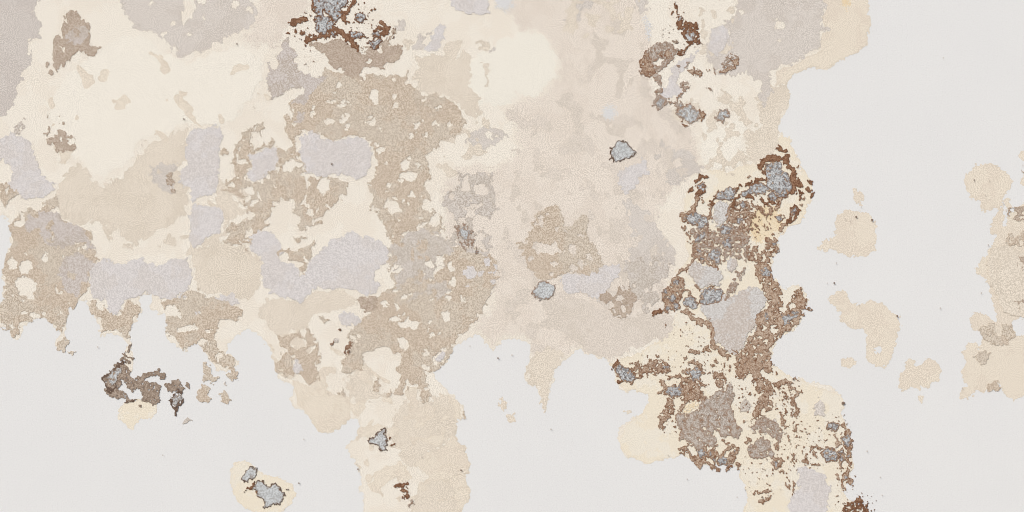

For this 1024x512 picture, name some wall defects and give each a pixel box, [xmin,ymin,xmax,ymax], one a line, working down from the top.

rust [286,0,396,65]
rust [639,3,739,127]
peeling [0,0,831,412]
peeling [1006,206,1024,271]
rust [611,144,877,512]
peeling [973,322,1016,365]
rust [101,343,190,416]
peeling [987,380,1001,392]
rust [367,427,395,453]
rust [241,466,289,509]
rust [393,482,415,507]
peeling [787,465,831,512]